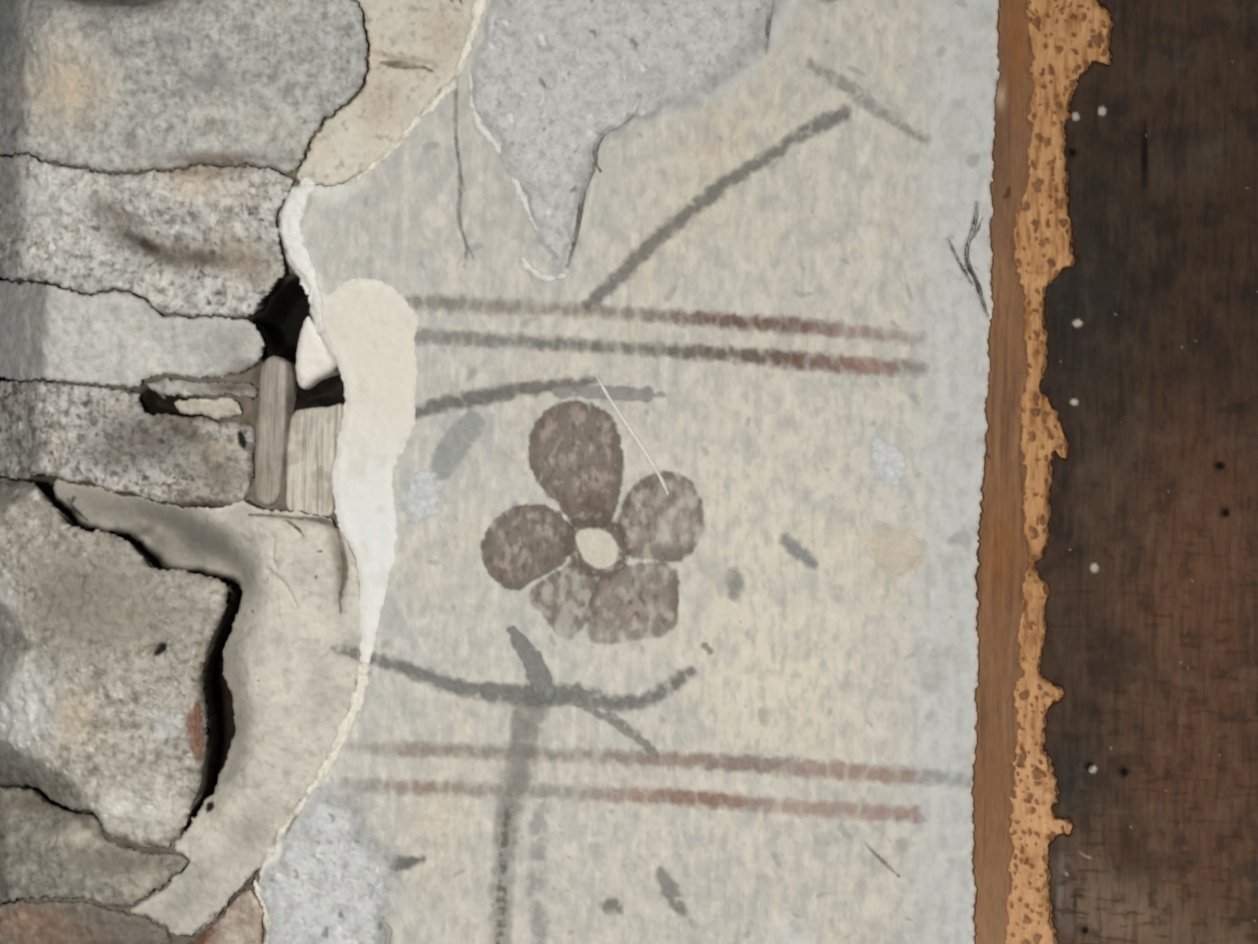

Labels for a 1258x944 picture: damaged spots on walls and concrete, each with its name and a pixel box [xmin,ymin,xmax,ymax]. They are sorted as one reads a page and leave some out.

crack [455,135,467,254]
flaking render [356,0,776,282]
crack [570,134,605,257]
crack [950,216,989,317]
flaking render [254,663,395,944]